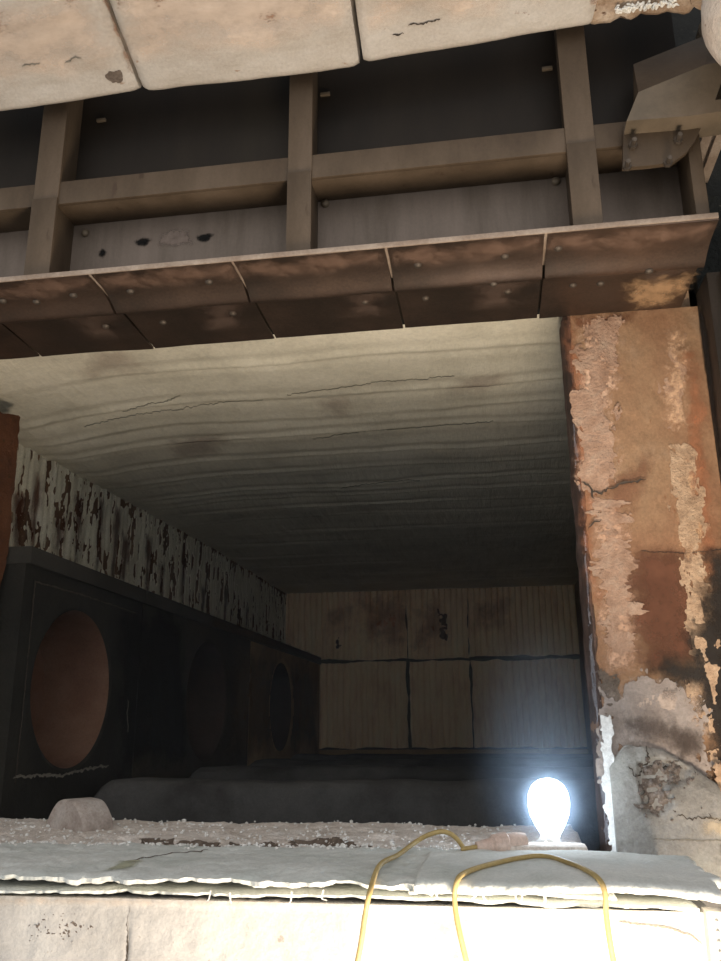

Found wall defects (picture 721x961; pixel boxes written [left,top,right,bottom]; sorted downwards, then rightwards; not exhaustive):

crack [85,396,262,427]
crack [288,376,454,396]
corrosion [13,478,40,546]
corrosion [55,498,82,563]
corrosion [97,500,130,579]
peeling [9,444,286,644]
crack [582,478,646,529]
peeling [569,314,721,821]